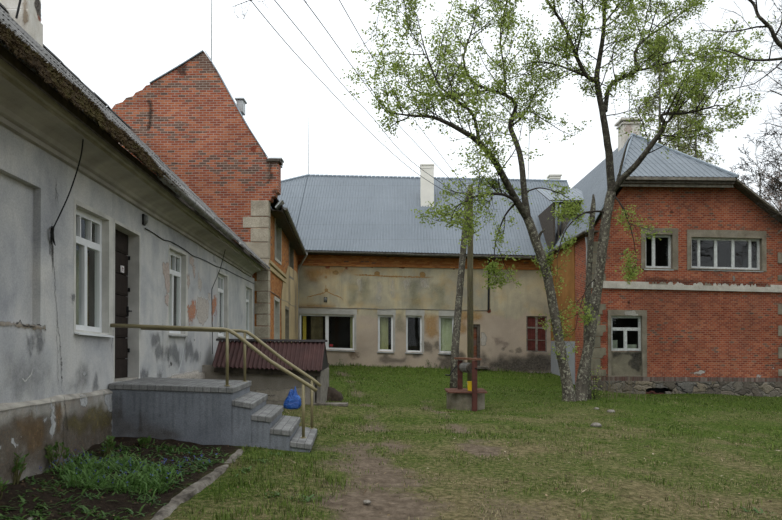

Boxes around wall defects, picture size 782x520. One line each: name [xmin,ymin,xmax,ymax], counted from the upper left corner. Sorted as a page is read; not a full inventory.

crack [13,317,68,450]
peeling [44,404,56,436]
leakage [0,412,112,482]